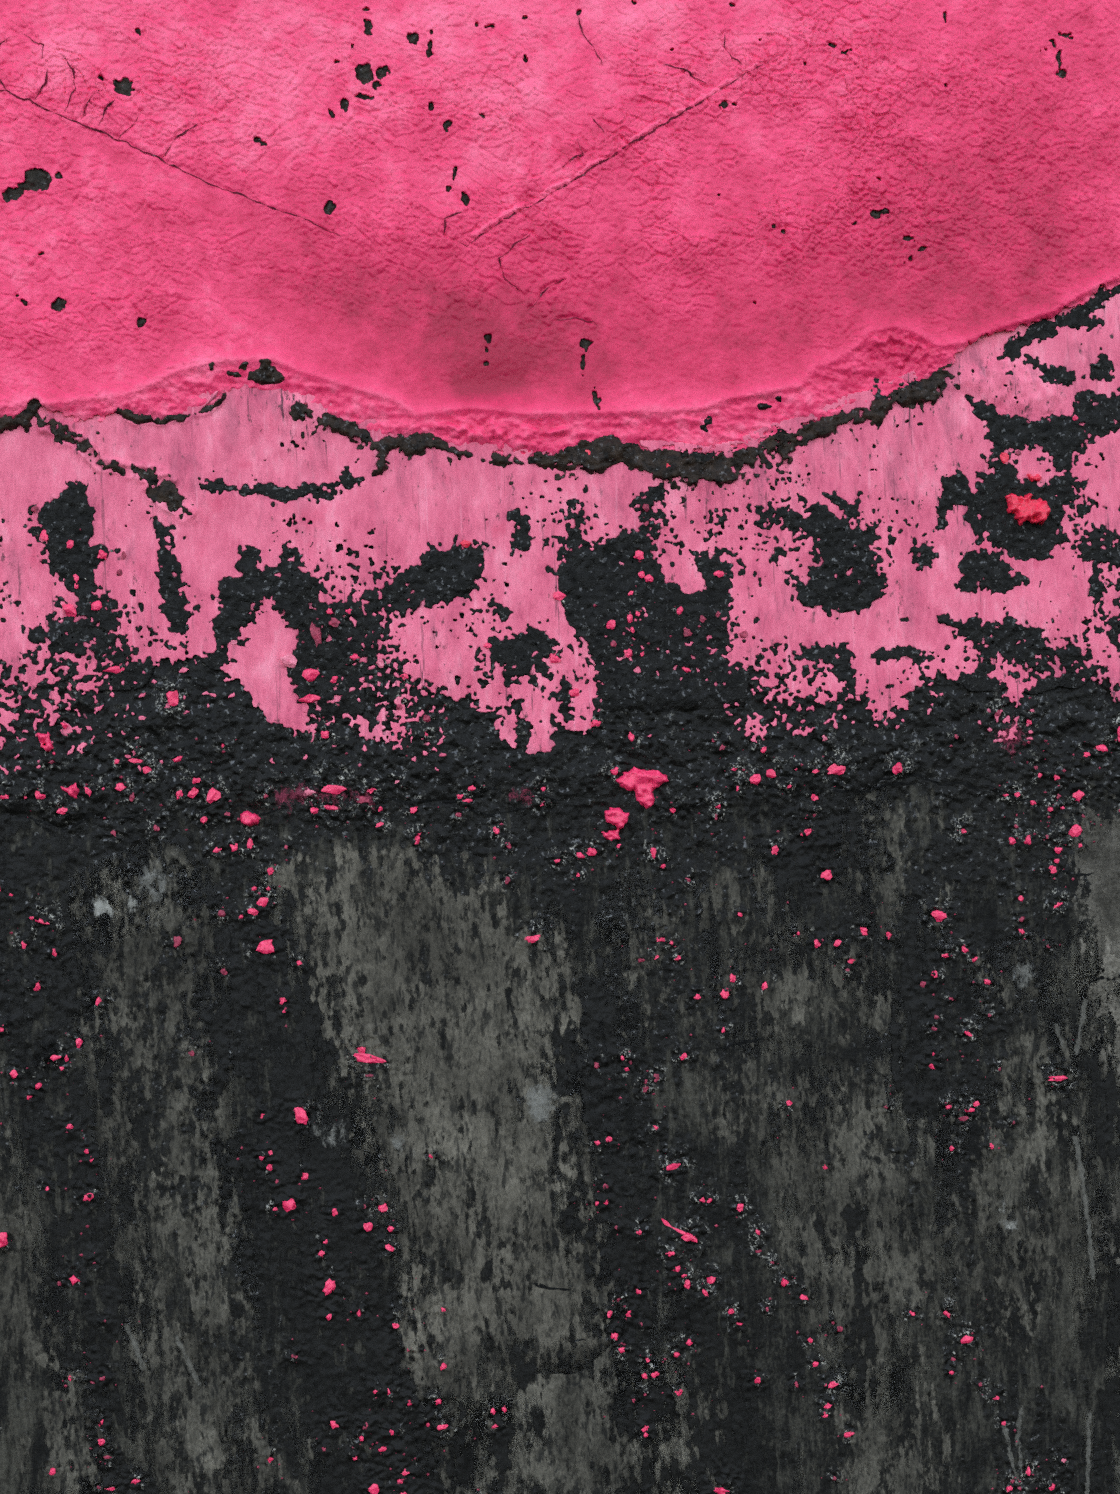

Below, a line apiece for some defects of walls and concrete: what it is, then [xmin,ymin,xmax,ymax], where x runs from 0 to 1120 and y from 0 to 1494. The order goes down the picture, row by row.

peeling [0,0,1120,791]
water stain [93,869,165,916]
water stain [527,1087,551,1120]
water stain [1071,1051,1120,1169]
water stain [125,1324,145,1370]
water stain [608,1274,794,1494]
water stain [467,1404,543,1494]
water stain [1015,1408,1023,1469]